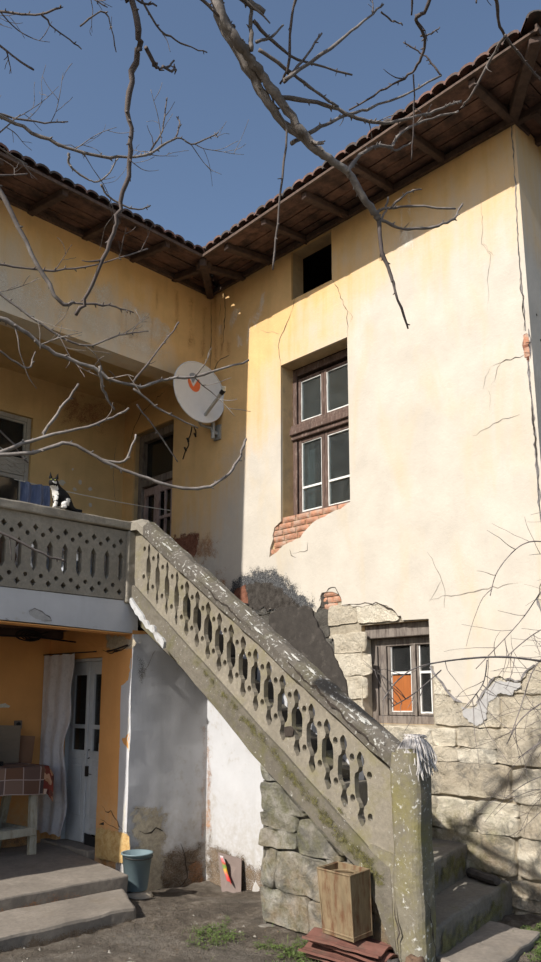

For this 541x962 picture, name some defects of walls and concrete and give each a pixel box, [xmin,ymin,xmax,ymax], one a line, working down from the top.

crack [511,126,526,331]
spalling [522,329,531,361]
crack [481,355,541,521]
spalling [271,502,349,555]
mould [230,565,315,614]
peeling [103,598,166,683]
flaking render [384,662,541,916]
flaking render [95,801,171,891]